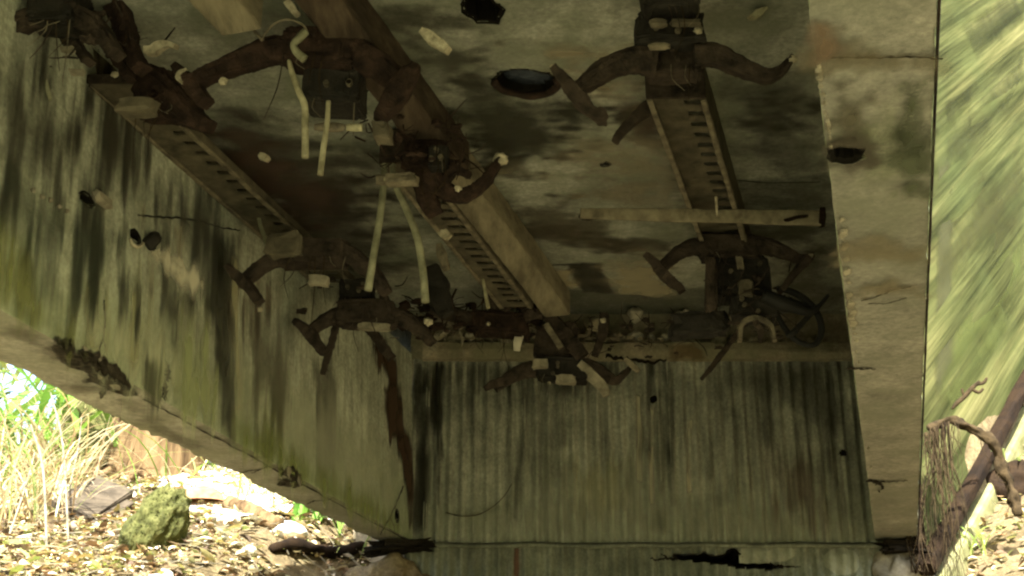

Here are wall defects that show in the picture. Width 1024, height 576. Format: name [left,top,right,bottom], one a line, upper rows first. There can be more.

leakage [0,46,60,265]
leakage [29,203,104,352]
leakage [67,87,94,152]
spalling [52,336,137,399]
leakage [99,100,151,198]
leakage [121,191,240,443]
leakage [204,109,409,268]
rust [373,339,414,528]
leakage [412,364,443,530]
leakage [378,7,581,177]
leakage [517,209,672,296]
crack [650,553,678,561]